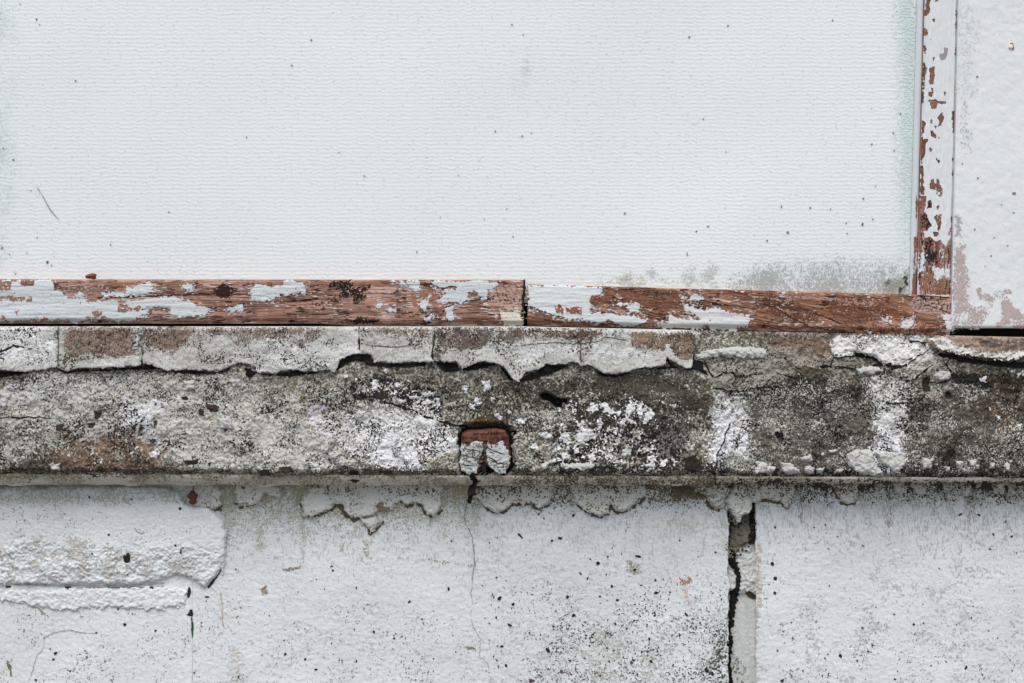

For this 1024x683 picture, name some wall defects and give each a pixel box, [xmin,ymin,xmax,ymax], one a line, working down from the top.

peeling [912,0,1024,332]
peeling [0,280,34,340]
peeling [62,310,325,363]
peeling [360,327,493,360]
peeling [513,327,603,342]
peeling [555,294,601,315]
peeling [628,330,698,362]
spalling [854,353,892,367]
crack [890,339,1024,405]
crack [384,401,517,680]
water stain [132,430,1024,649]
crack [727,503,756,683]